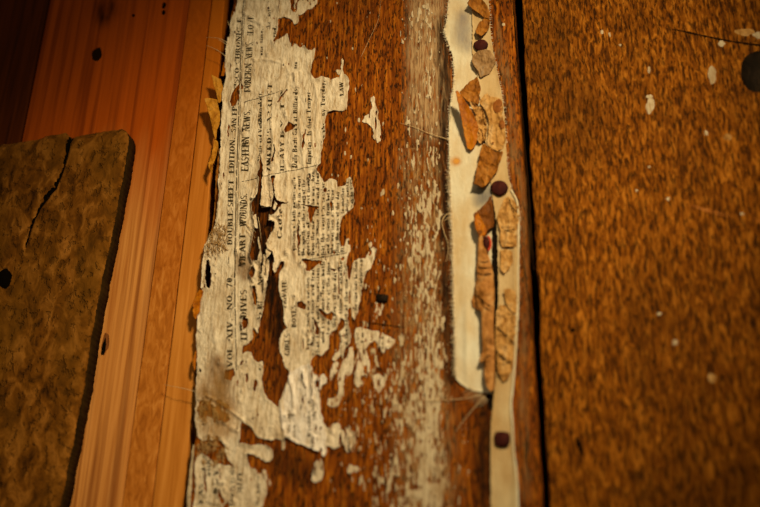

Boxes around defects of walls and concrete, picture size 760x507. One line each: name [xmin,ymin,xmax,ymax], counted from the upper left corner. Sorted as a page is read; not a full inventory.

crack [25,137,74,247]
peeling [338,0,460,507]